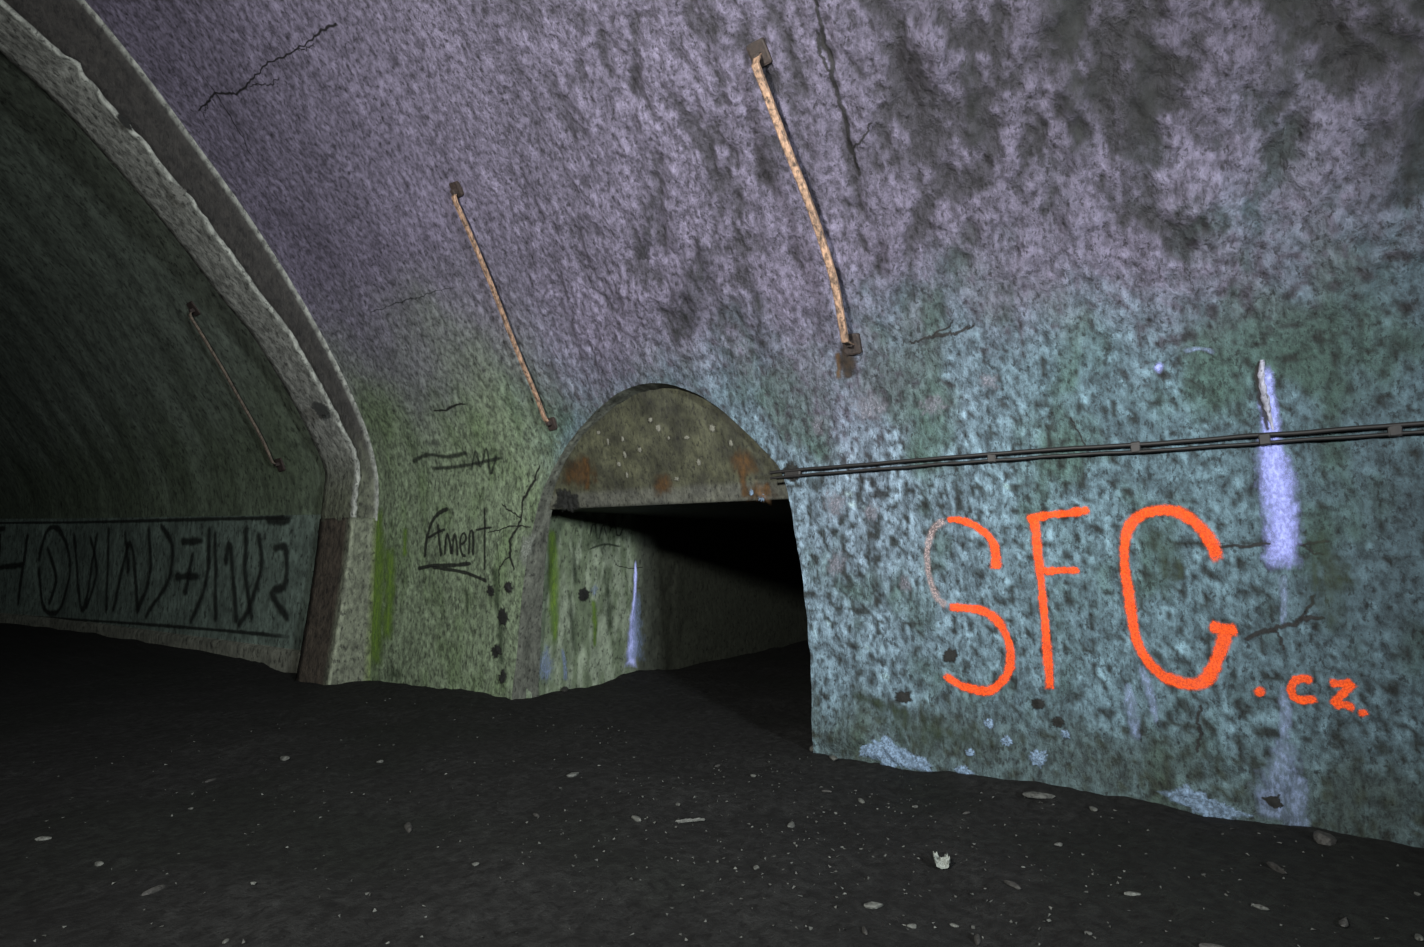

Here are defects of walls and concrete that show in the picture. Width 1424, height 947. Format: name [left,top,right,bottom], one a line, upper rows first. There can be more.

crack [190,23,337,169]
corrosion [746,37,863,378]
corrosion [186,301,286,472]
corrosion [449,181,558,431]
water stain [1261,372,1297,563]
crack [1244,595,1324,650]